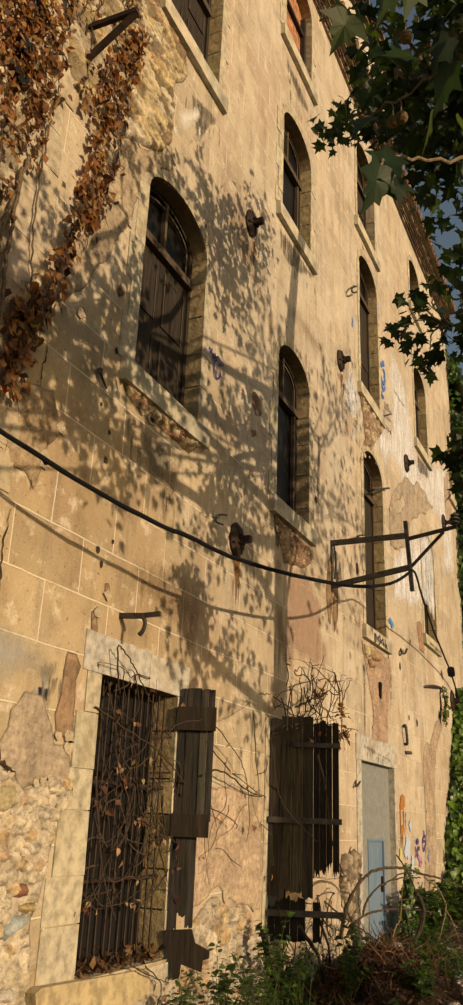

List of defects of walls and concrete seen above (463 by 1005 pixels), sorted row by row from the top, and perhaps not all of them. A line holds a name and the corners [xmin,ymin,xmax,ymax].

spalling [55,0,200,307]
spalling [6,384,66,489]
spalling [252,392,263,416]
spalling [360,396,392,463]
crack [0,510,11,580]
spalling [274,515,313,569]
spalling [389,477,433,550]
spalling [444,473,452,526]
spalling [362,641,401,745]
spalling [0,652,81,1005]
spalling [164,783,362,1005]